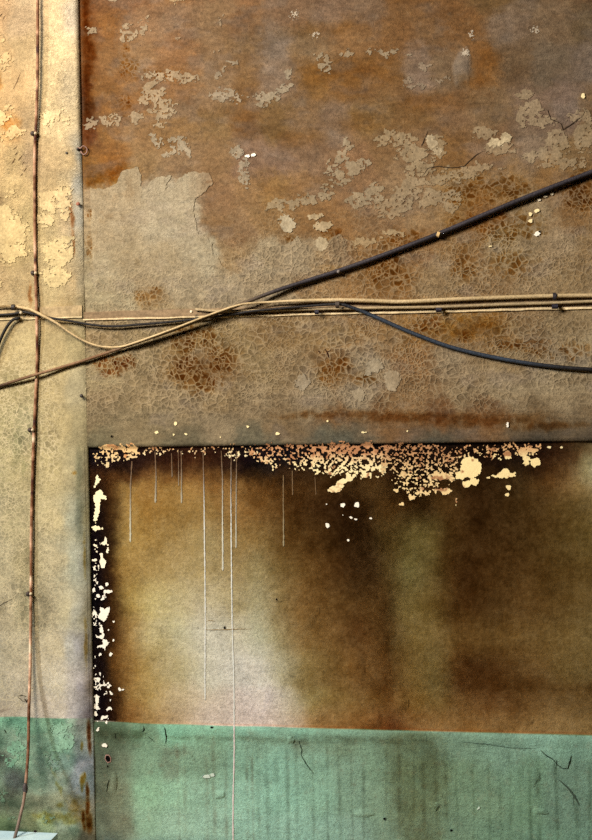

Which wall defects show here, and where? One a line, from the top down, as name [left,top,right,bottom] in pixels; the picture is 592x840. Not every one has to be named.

peeling [0,104,27,142]
peeling [34,109,70,126]
spalling [90,89,592,292]
peeling [0,185,73,264]
peeling [39,236,75,288]
rust [171,330,229,390]
peeling [91,431,563,731]
damp [108,442,592,840]
rust [82,786,92,829]